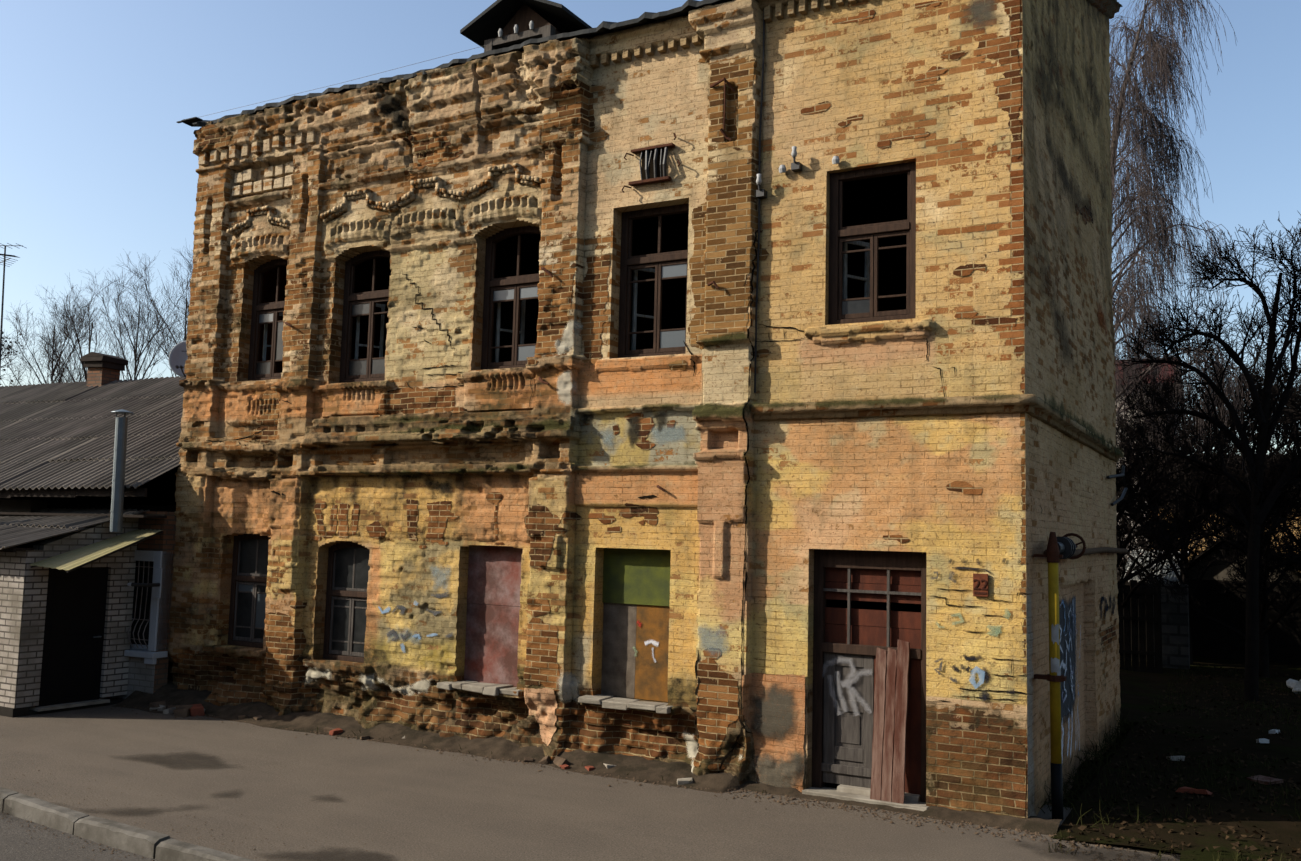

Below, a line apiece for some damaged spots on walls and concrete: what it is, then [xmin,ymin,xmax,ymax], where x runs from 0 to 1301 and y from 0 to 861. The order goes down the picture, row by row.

peeling [550,71,609,142]
crack [382,273,466,392]
peeling [612,413,675,450]
peeling [486,492,504,545]
spalling [524,503,659,570]
spalling [366,597,739,771]
leakage [751,684,794,740]
leakage [684,732,698,772]
leakage [739,753,805,788]